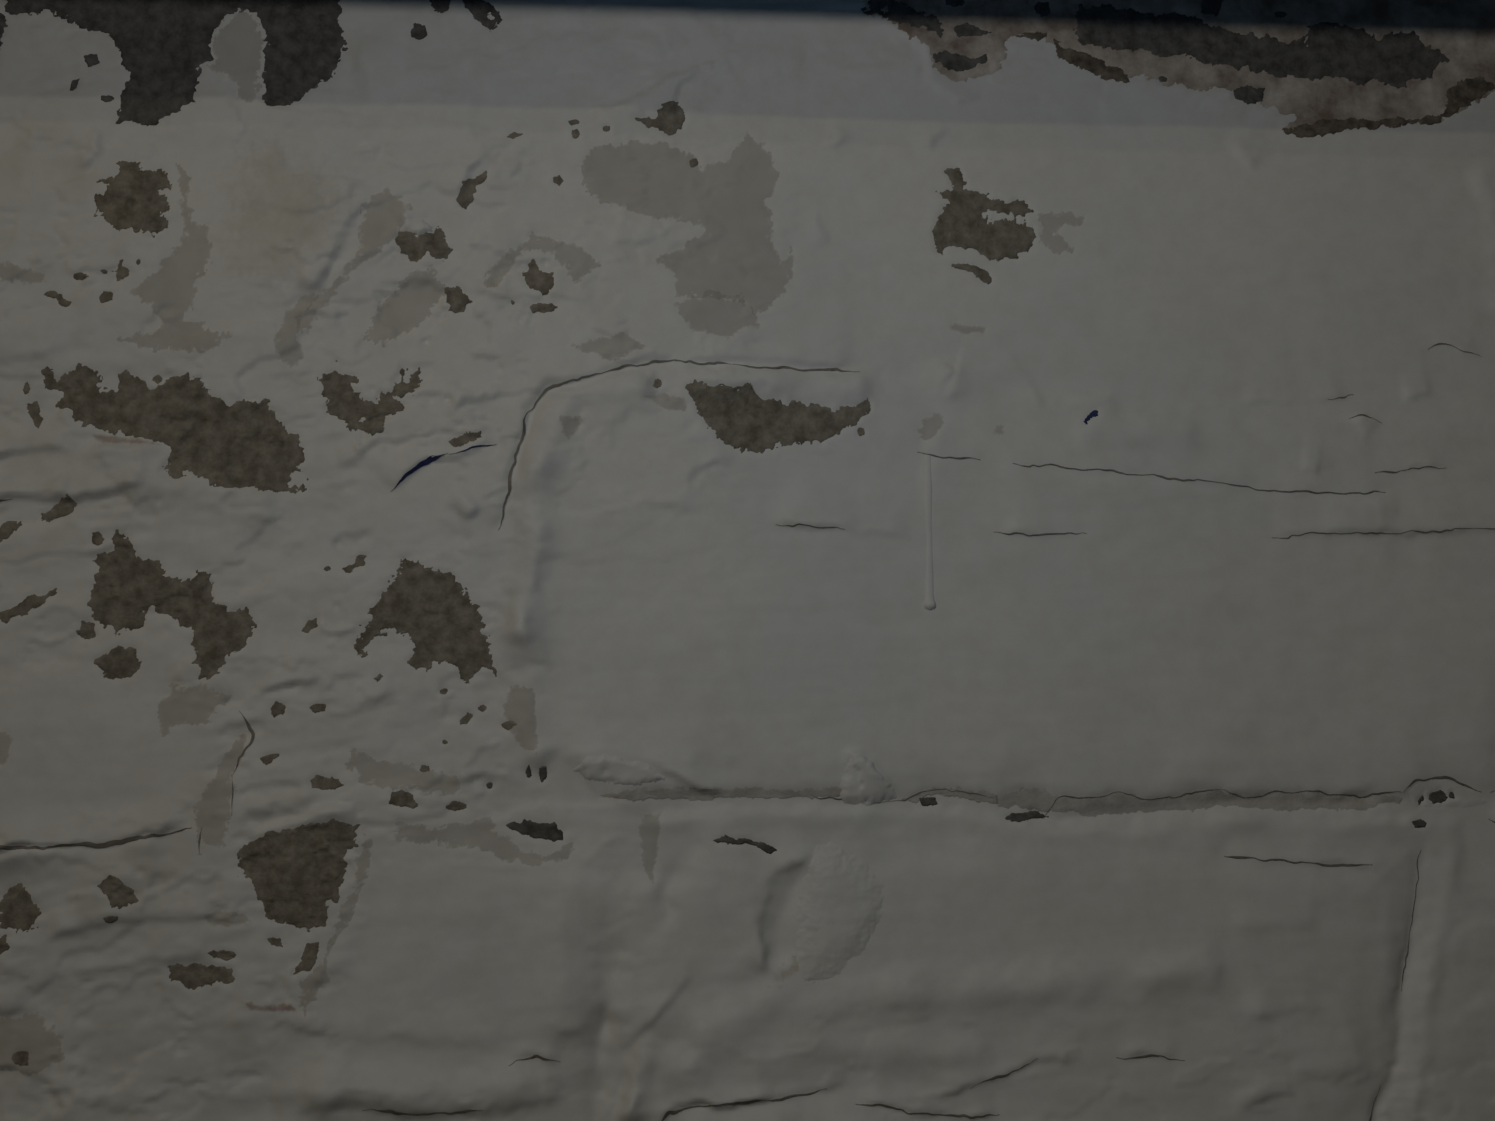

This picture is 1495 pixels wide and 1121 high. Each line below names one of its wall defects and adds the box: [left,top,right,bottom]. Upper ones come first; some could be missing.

flaking render [0,0,348,126]
peeling [861,0,1495,130]
flaking render [23,363,309,494]
crack [498,359,858,530]
crack [920,452,1447,494]
crack [1272,528,1495,539]
flaking render [76,529,257,680]
flaking render [353,557,497,694]
flaking render [237,818,360,975]
crack [1045,776,1495,823]
crack [1225,856,1372,866]
crack [661,1058,1037,1121]